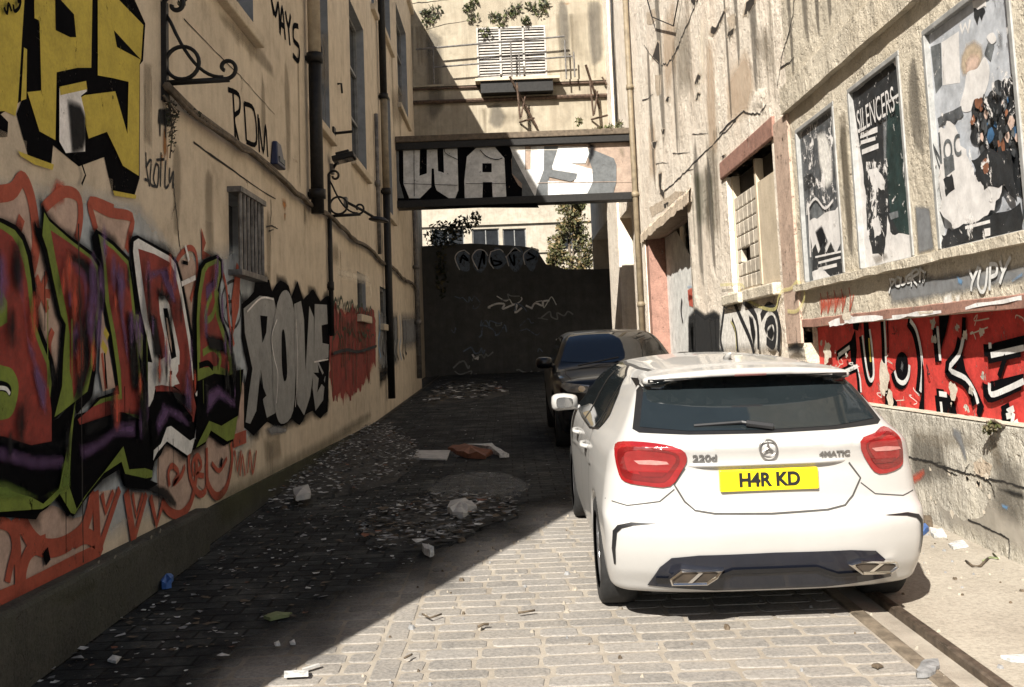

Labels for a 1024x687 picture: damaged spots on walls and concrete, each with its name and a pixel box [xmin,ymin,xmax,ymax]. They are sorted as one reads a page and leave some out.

crack [909,456,1024,497]